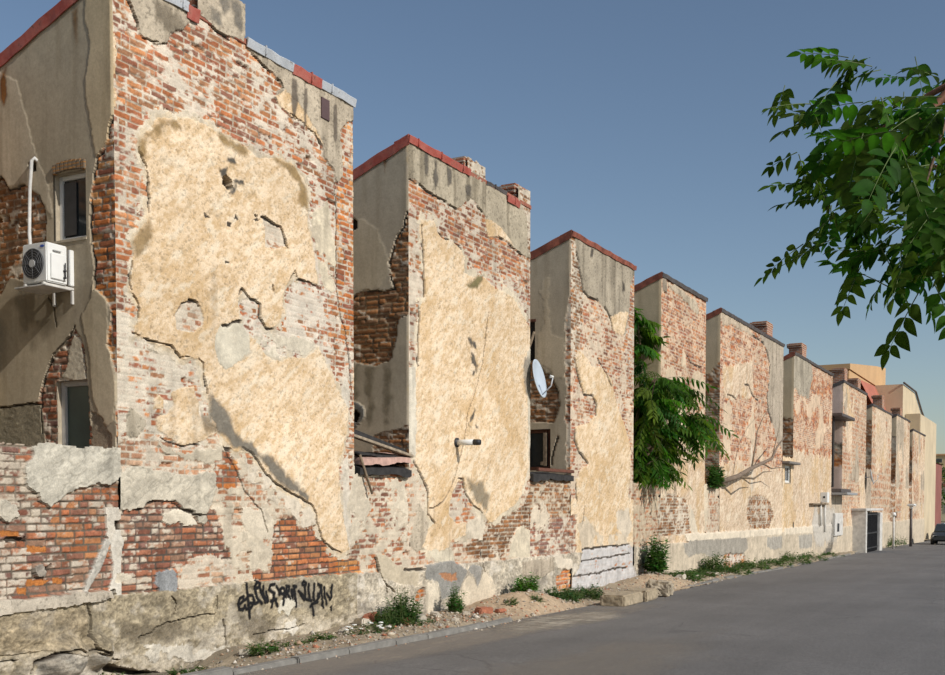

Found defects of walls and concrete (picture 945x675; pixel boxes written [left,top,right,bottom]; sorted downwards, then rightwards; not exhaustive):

leakage [156,3,183,30]
leakage [214,0,242,30]
leakage [425,153,452,186]
spalling [0,179,47,294]
spalling [25,0,530,594]
crack [413,312,490,524]
spalling [530,237,660,500]
spalling [657,277,872,547]
peeling [0,499,47,552]
spalling [371,425,573,612]
crack [9,603,118,674]
crack [139,595,227,645]